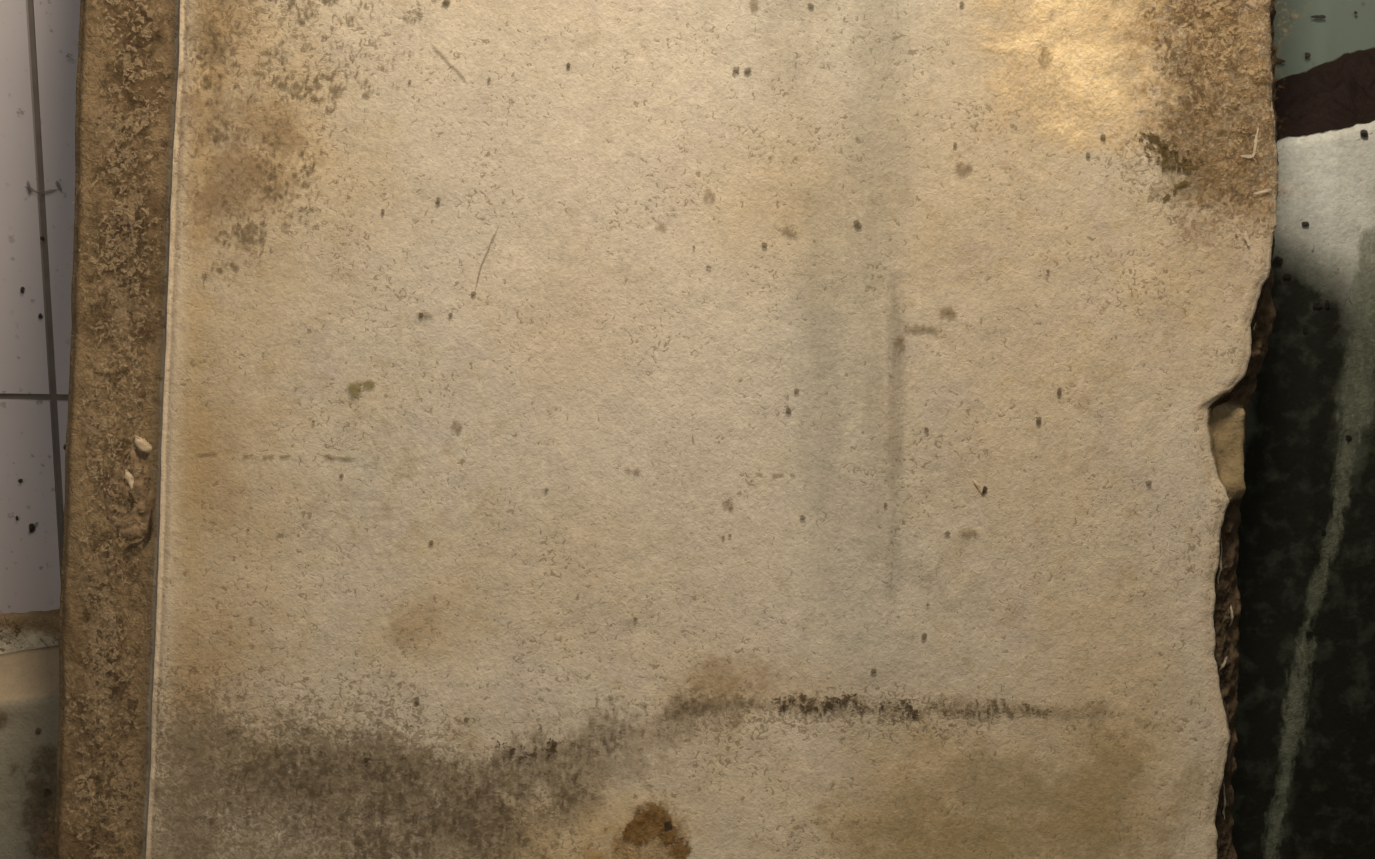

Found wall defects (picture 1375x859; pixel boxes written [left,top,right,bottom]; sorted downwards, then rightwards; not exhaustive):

water stain [983,0,1280,239]
rust [622,802,692,859]